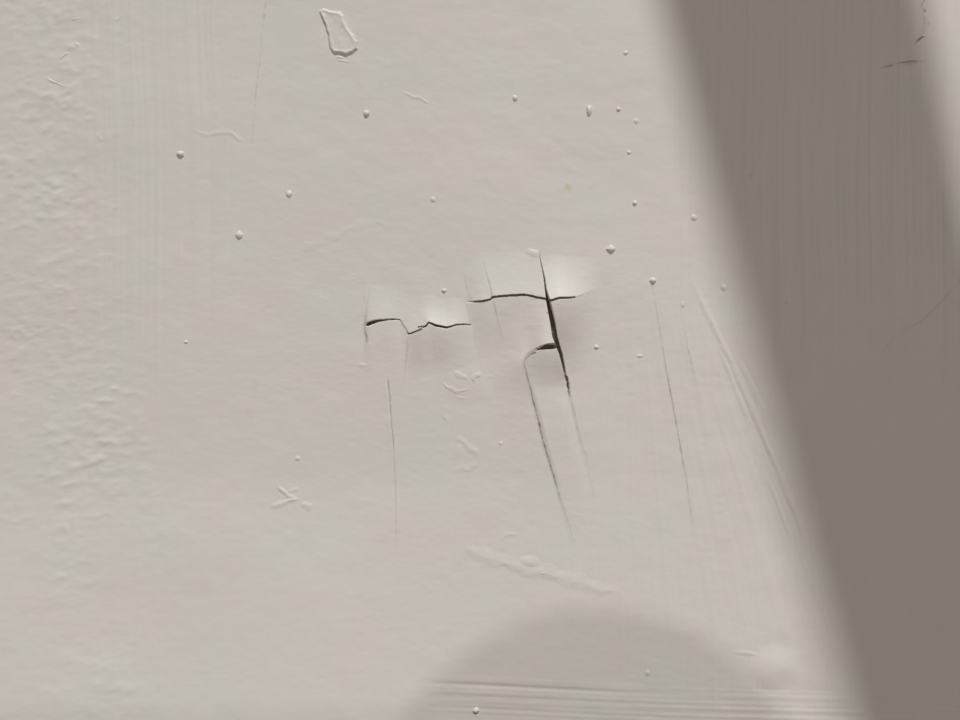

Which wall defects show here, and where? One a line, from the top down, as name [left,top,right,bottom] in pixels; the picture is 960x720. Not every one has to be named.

crack [358,247,603,562]